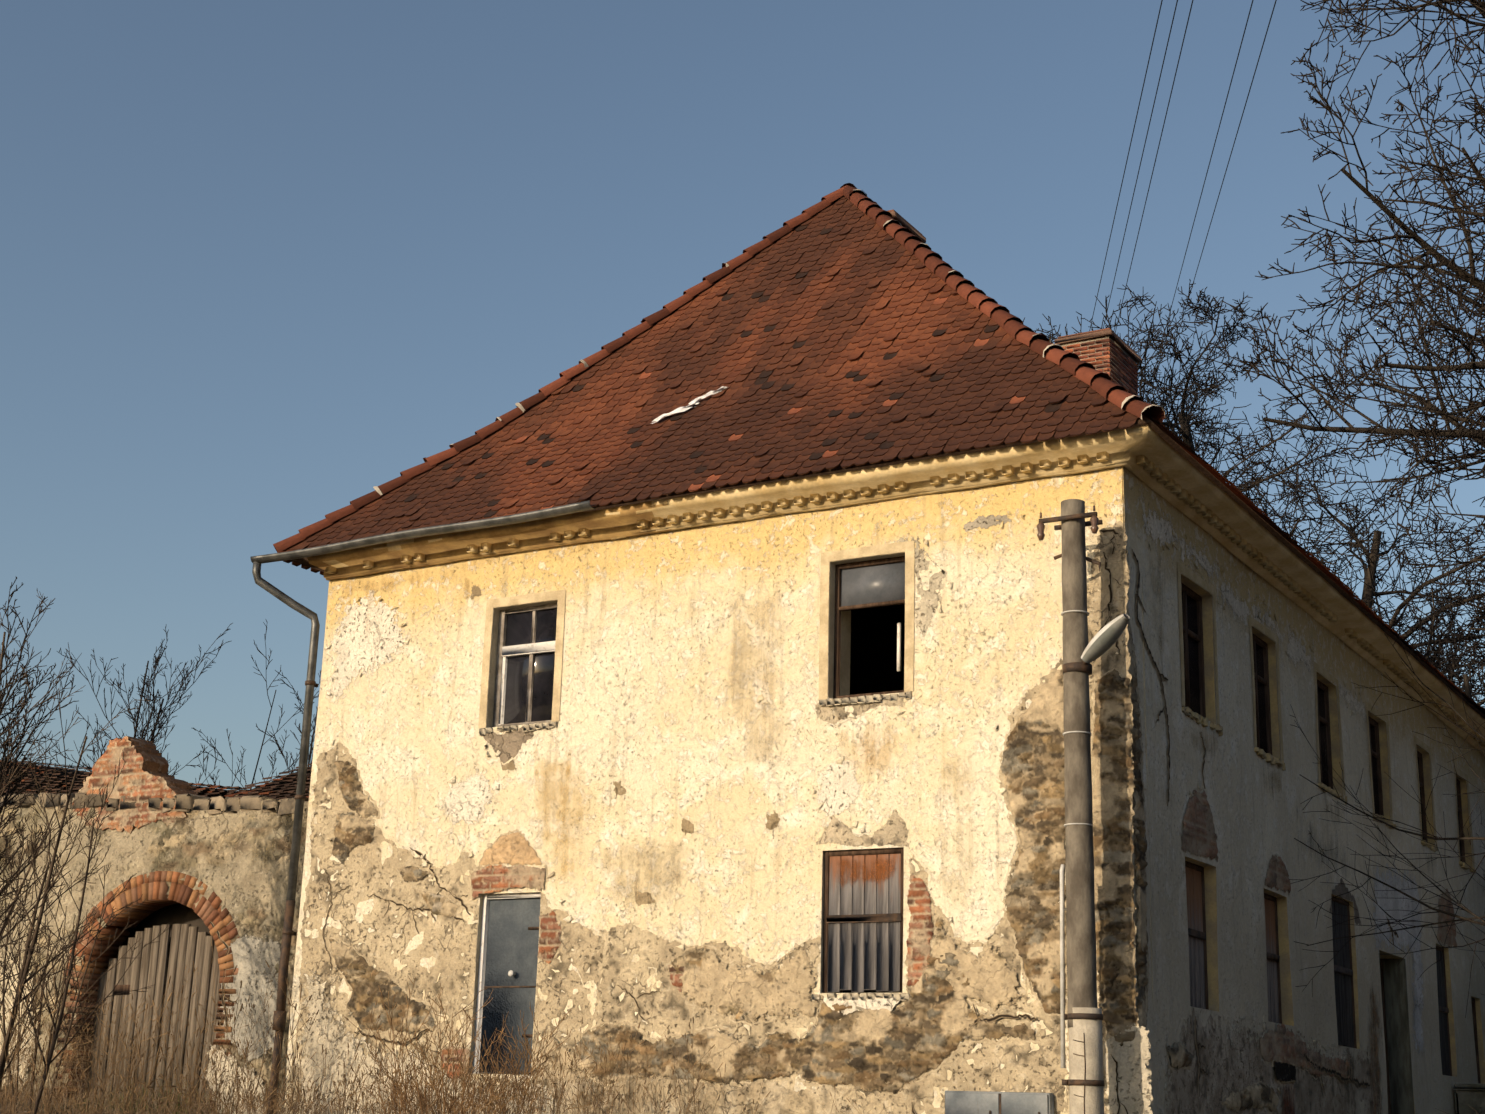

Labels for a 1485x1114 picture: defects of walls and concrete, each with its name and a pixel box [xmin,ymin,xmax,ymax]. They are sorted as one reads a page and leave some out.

crack [1098,529,1206,806]
flaking render [220,935,281,1062]
flaking render [287,659,1070,1114]
flaking render [1087,507,1225,1114]
flaking render [1160,1007,1382,1114]
flaking render [1263,851,1291,896]